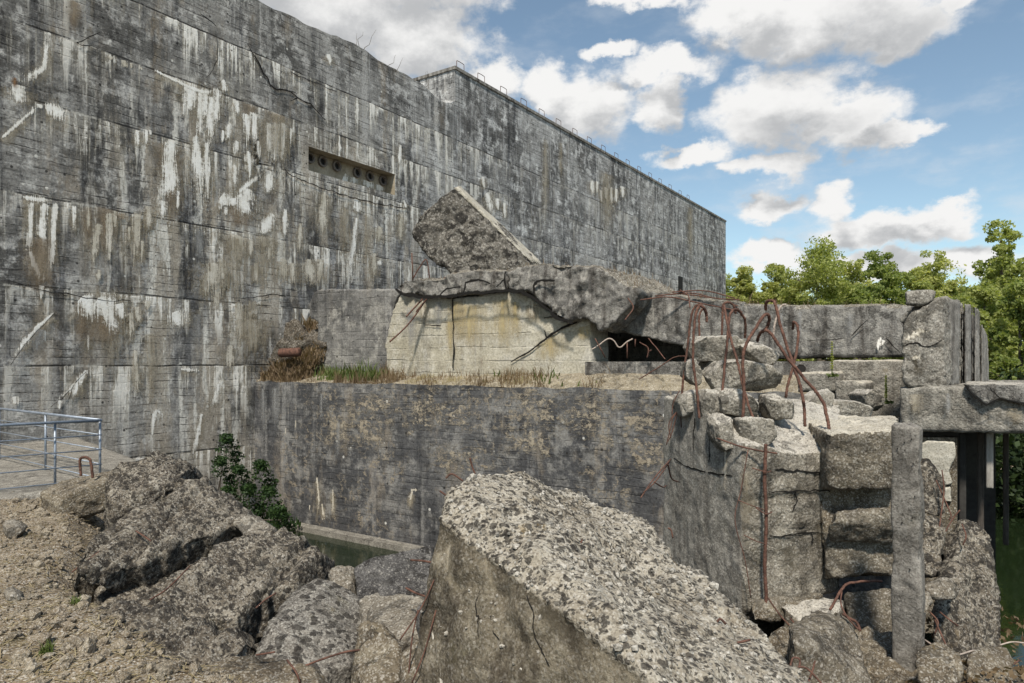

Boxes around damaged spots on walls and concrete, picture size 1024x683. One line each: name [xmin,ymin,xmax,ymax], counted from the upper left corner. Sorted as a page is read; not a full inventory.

crack [248,45,337,120]
damp [23,70,324,436]
crack [395,272,577,368]
crack [886,338,944,352]